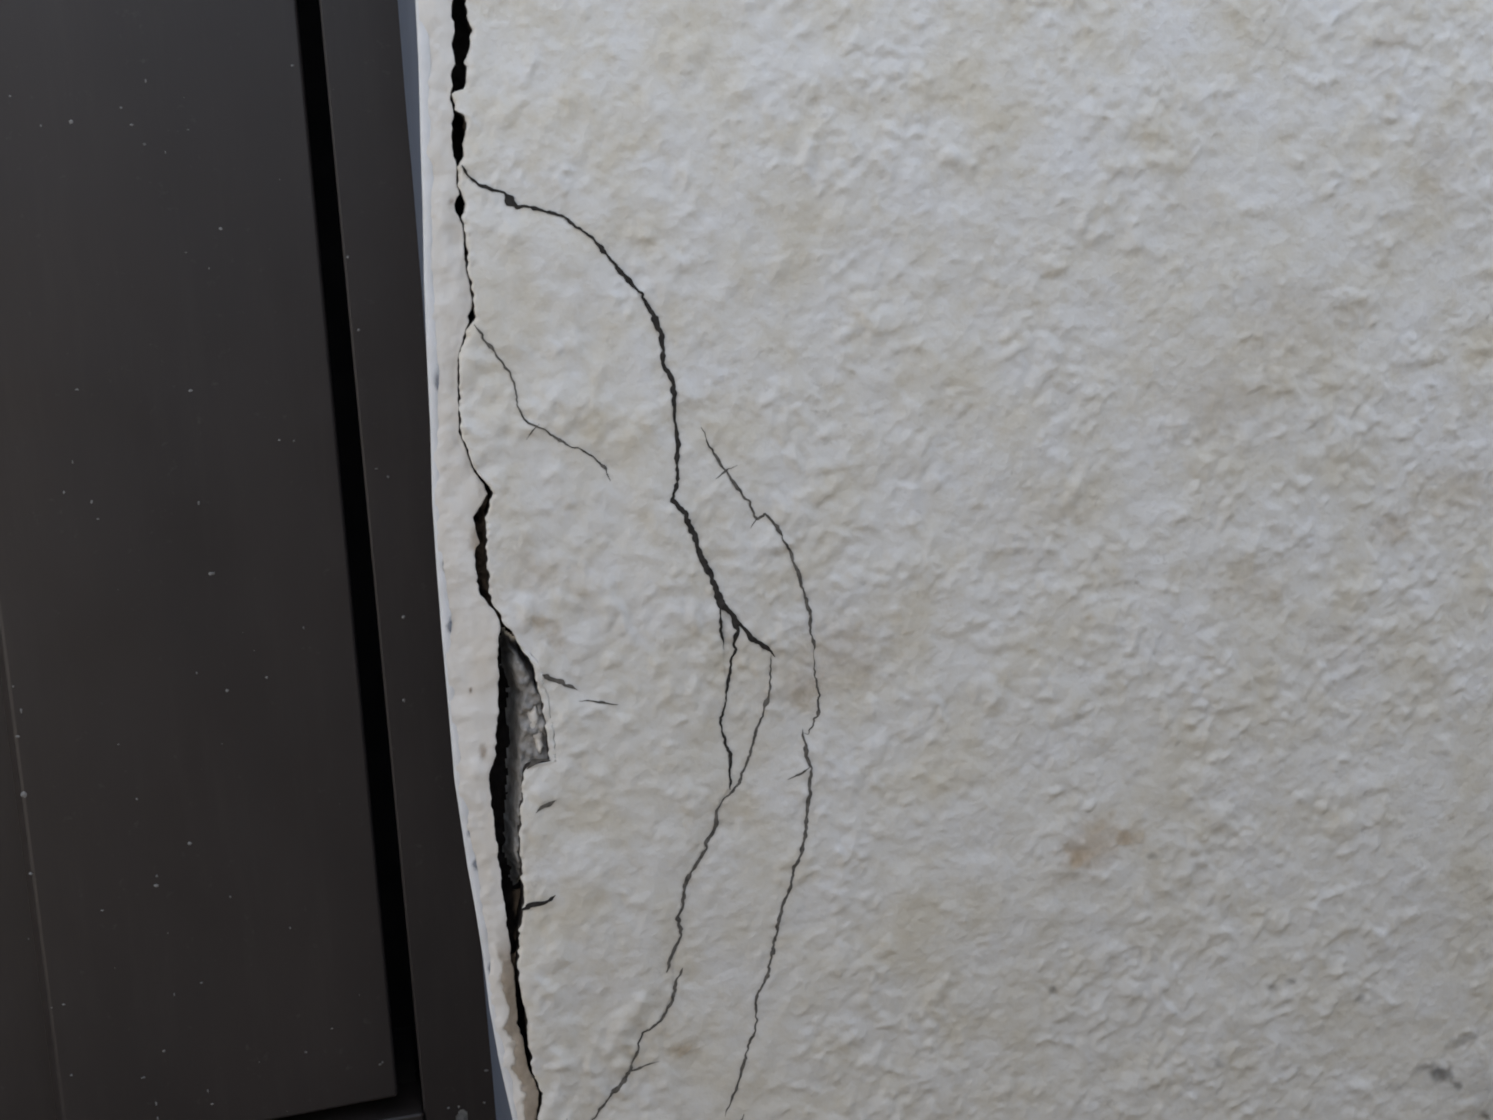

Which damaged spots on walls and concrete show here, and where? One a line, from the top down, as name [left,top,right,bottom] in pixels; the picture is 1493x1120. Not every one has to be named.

crack [450,0,821,1120]